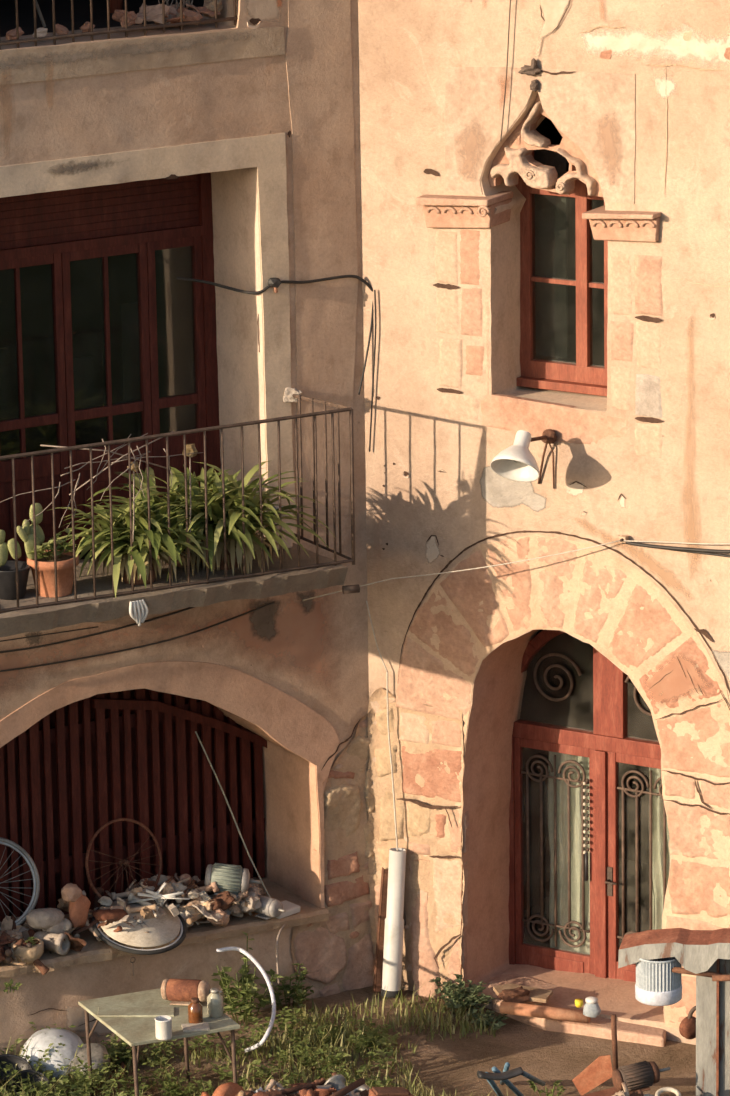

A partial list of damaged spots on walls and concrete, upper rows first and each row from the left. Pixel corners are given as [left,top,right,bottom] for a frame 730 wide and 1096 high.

flaking render [247,0,282,29]
flaking render [537,0,570,56]
flaking render [581,25,730,98]
flaking render [480,466,546,511]